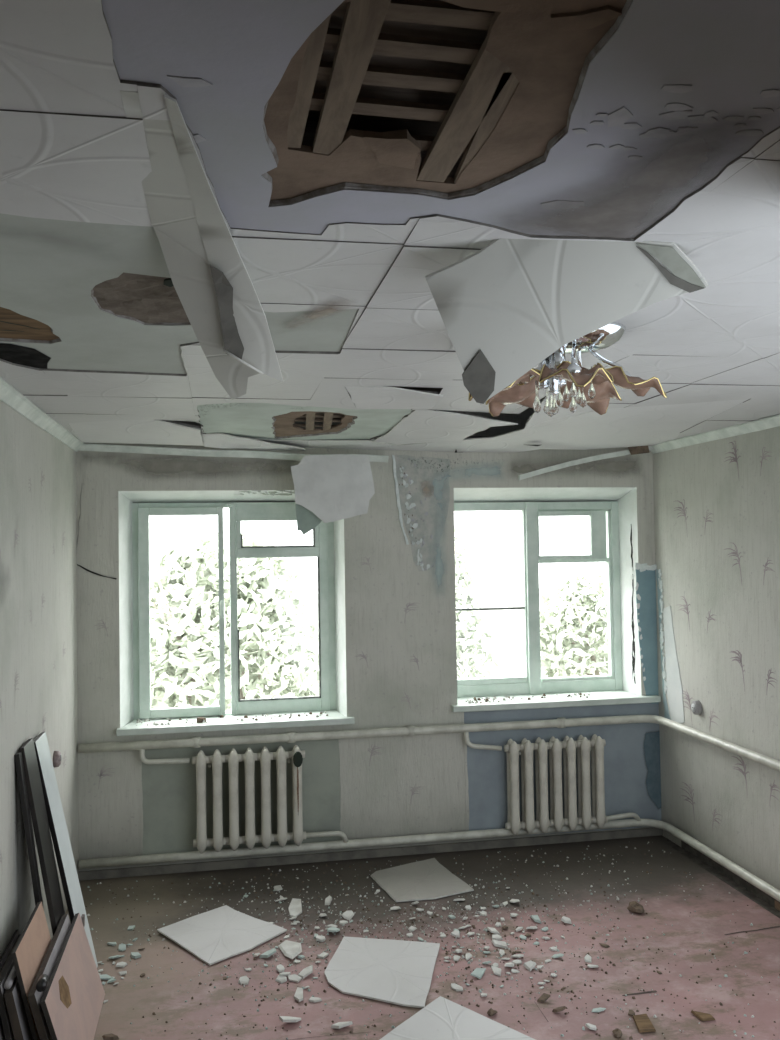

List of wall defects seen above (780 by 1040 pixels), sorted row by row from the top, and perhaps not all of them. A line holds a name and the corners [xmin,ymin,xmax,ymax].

flaking render [102,0,780,236]
water stain [524,126,727,293]
flaking render [0,213,198,374]
flaking render [197,403,412,440]
crack [77,487,117,580]
peeling [392,455,450,571]